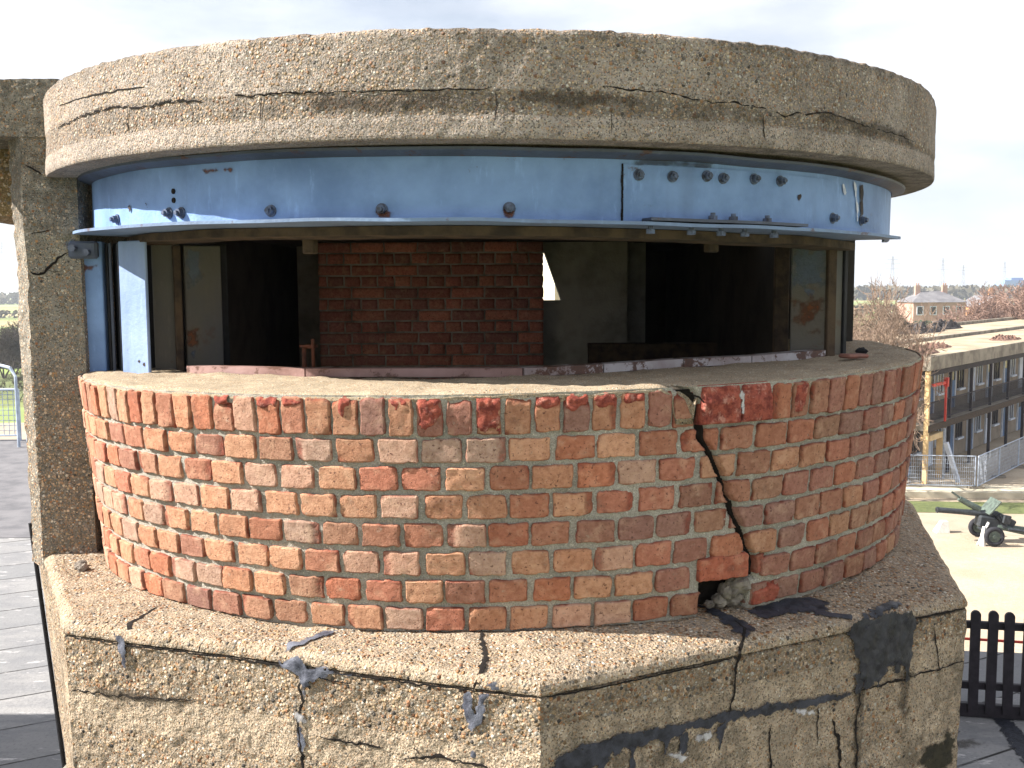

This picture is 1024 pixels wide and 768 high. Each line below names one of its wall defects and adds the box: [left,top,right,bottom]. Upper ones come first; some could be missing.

crack [58,87,201,133]
crack [235,87,498,121]
crack [603,86,914,142]
crack [30,252,68,275]
crack [675,389,751,574]
crack [68,606,747,768]
leakage [552,692,852,768]